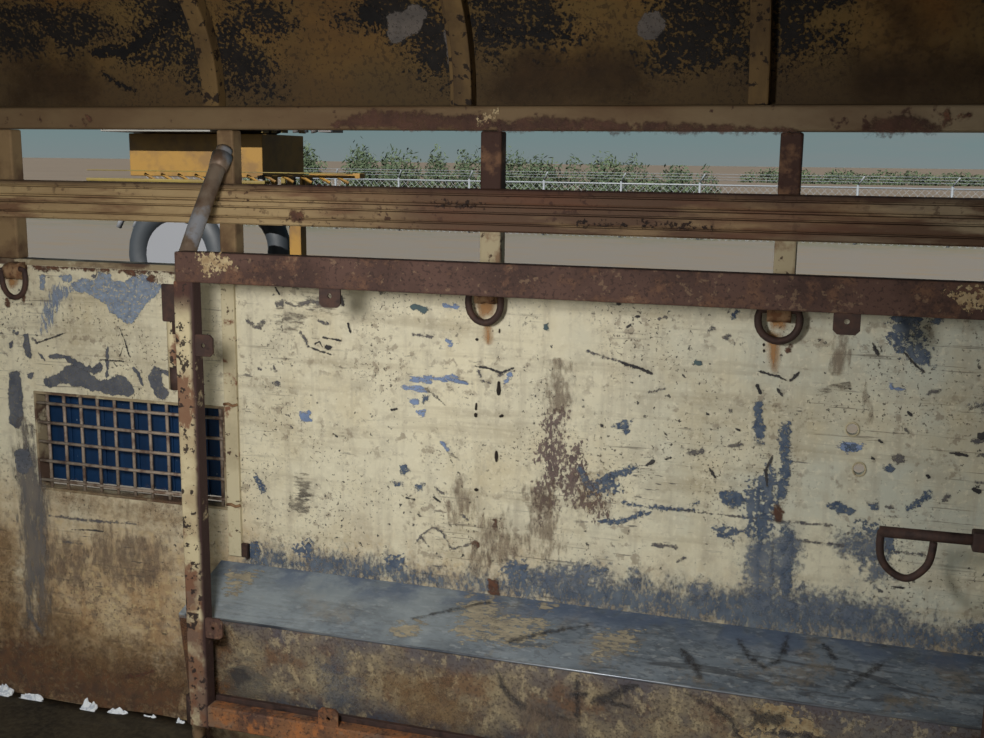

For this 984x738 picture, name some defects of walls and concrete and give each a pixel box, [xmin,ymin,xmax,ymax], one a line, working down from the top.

corrosion [331,108,797,135]
corrosion [866,115,941,138]
peeling [59,272,161,324]
peeling [7,330,169,435]
peeling [735,370,800,444]
peeling [837,441,875,460]
peeling [883,454,905,472]
damp [12,416,52,631]
spalling [577,457,951,563]